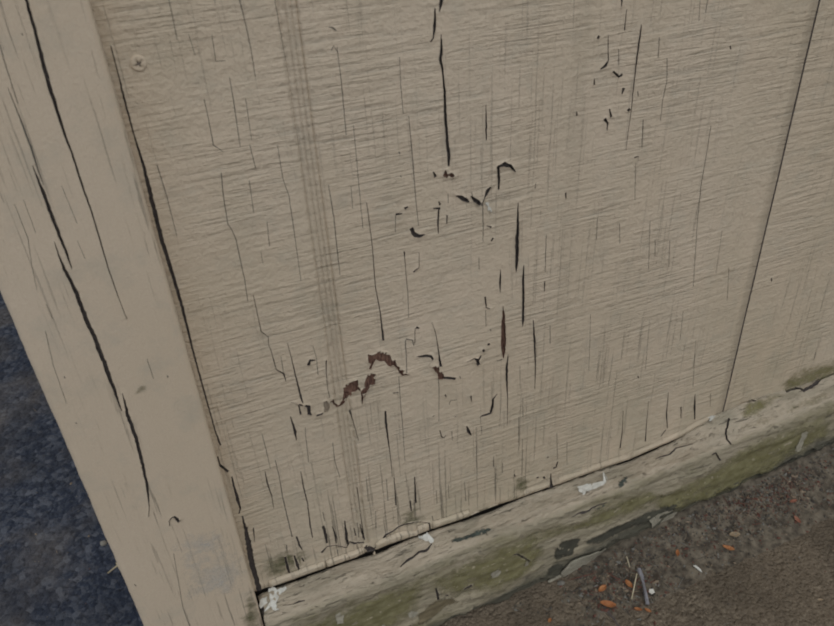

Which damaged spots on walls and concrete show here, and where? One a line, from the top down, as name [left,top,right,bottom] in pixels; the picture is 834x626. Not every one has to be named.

crack [430,0,451,166]
crack [600,0,667,183]
crack [0,0,150,517]
crack [110,46,466,618]
peeling [287,343,410,416]
peeling [417,323,461,386]
crack [484,203,547,442]
damp [707,441,834,500]
peeling [548,548,606,583]
damp [547,504,677,576]
peeling [649,510,677,528]
damp [419,599,455,624]